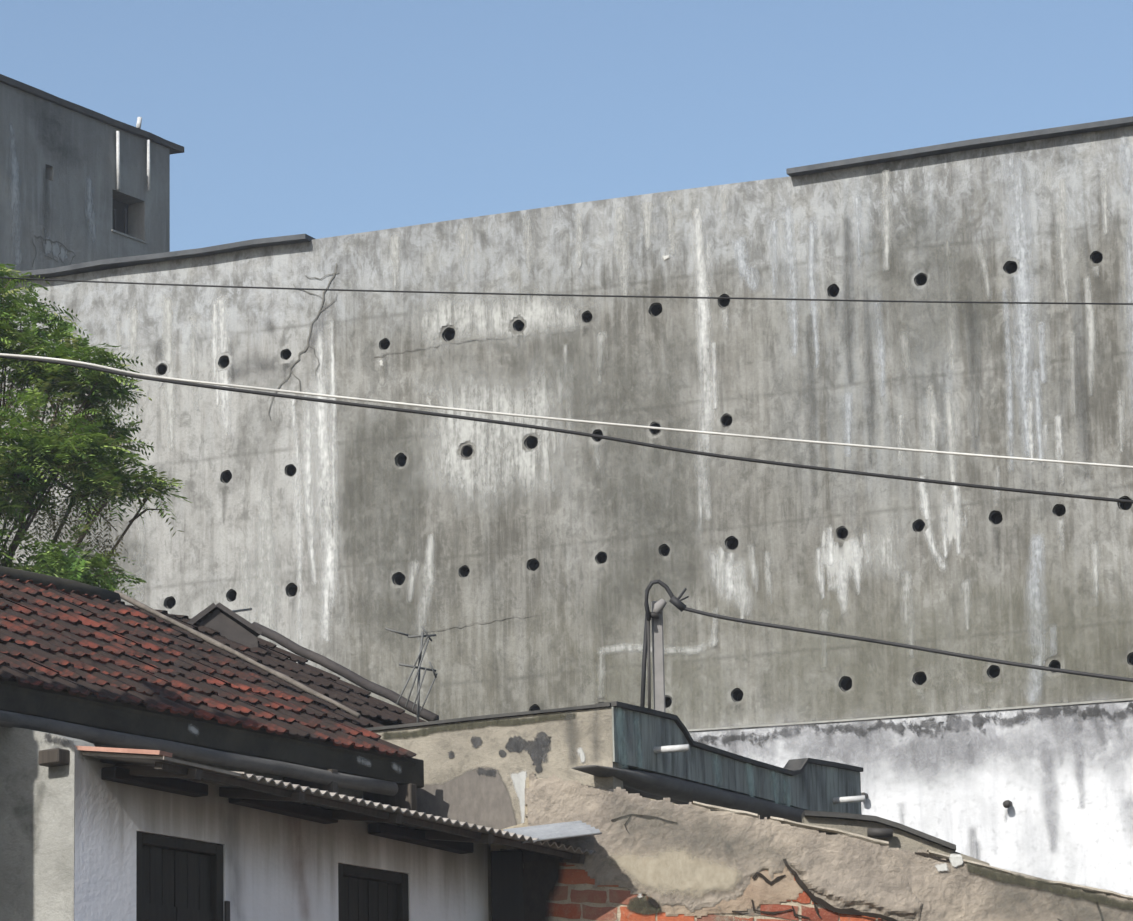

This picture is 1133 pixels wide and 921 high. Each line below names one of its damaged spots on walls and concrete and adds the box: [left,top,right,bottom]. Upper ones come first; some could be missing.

crack [268,263,339,419]
damp [695,208,727,519]
damp [735,241,756,288]
damp [772,208,818,367]
damp [1004,159,1062,467]
damp [1071,278,1095,412]
damp [928,385,955,488]
damp [919,477,945,568]
damp [599,623,716,697]
damp [696,537,1133,850]
peeling [608,850,739,915]
spalling [935,853,963,871]